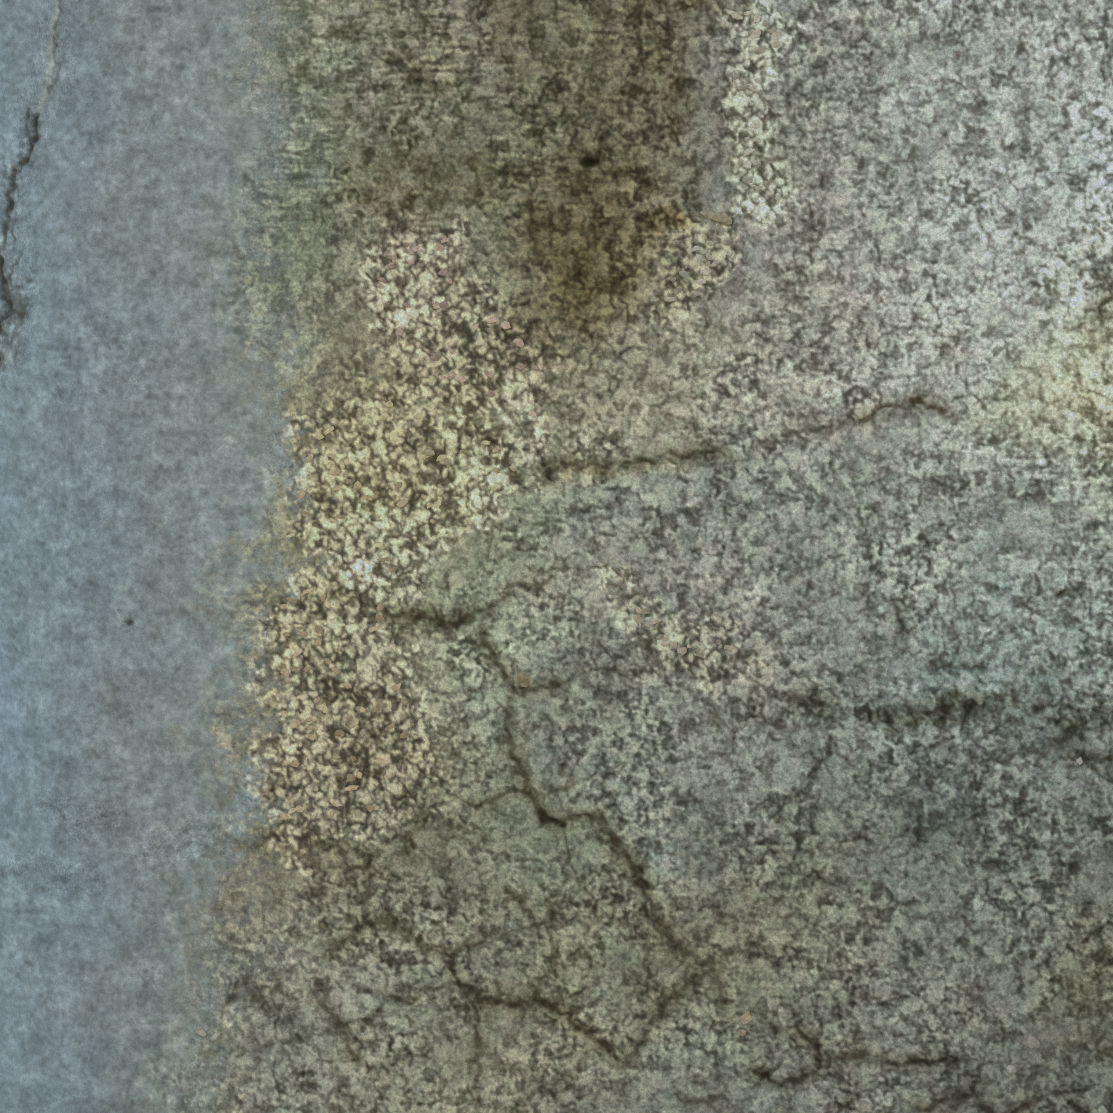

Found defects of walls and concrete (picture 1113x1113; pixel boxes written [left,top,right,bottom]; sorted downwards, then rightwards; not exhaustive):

crack [0,0,80,401]
crack [524,379,965,503]
crack [770,581,1003,751]
crack [1037,710,1113,782]
crack [0,557,743,1113]
crack [668,1012,1113,1113]